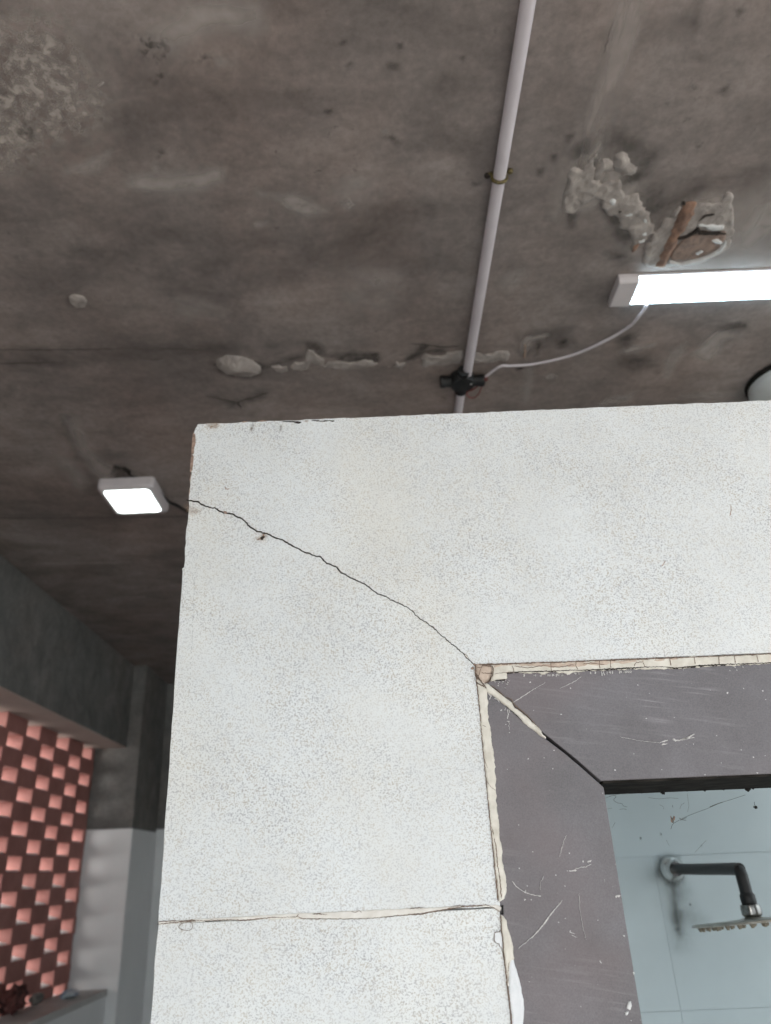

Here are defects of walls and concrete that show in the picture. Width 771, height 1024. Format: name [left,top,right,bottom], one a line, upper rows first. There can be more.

spalling [562,151,735,268]
peeling [271,336,542,373]
crack [0,500,771,1024]